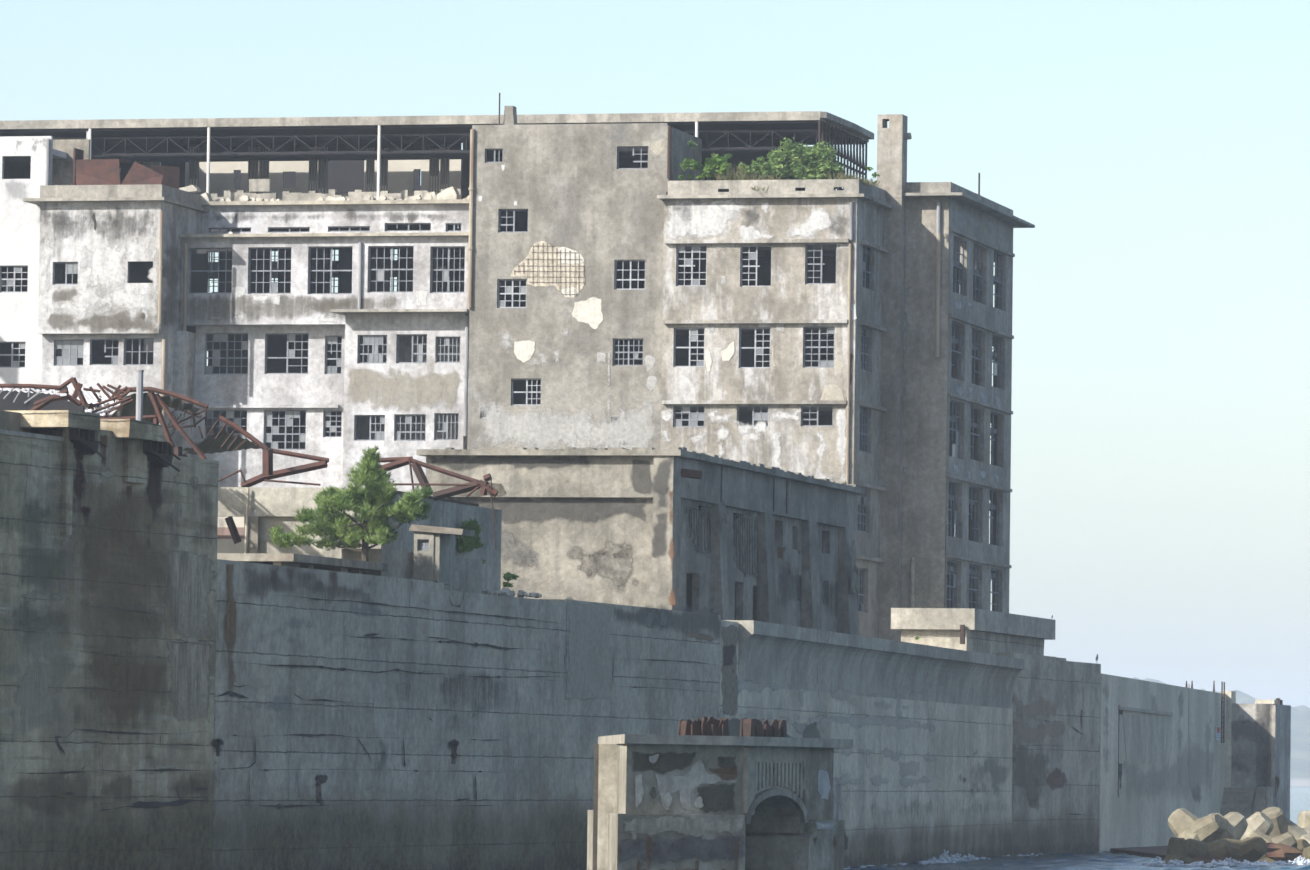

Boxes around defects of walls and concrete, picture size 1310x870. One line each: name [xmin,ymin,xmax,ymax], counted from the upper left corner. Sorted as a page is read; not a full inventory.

spalling [510,241,603,329]
spalling [514,340,535,363]
damp [163,503,215,721]
rust [225,564,236,685]
rust [677,717,787,737]
peeling [635,754,737,810]